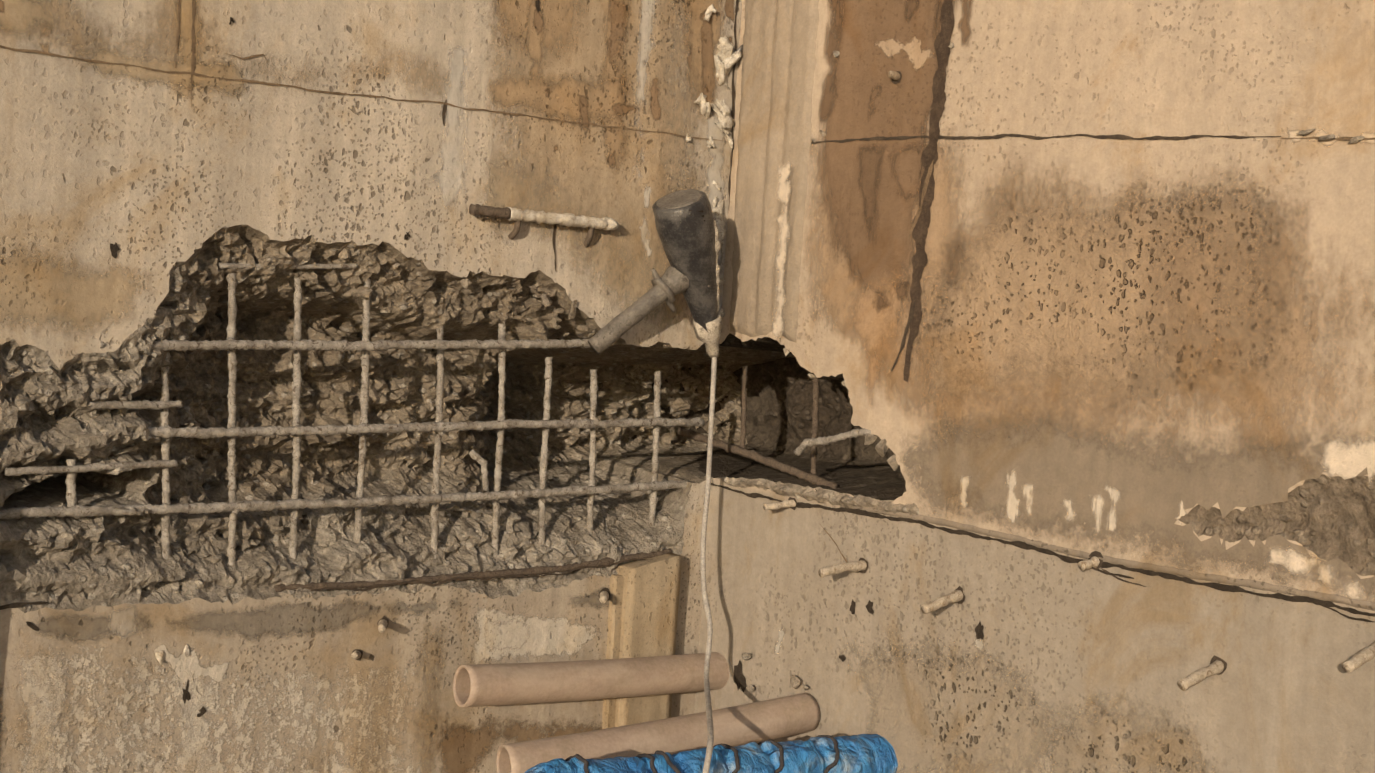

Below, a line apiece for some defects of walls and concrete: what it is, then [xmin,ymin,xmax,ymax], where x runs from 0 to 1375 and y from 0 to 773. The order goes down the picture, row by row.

crack [0,0,739,204]
crack [811,134,1375,144]
water stain [773,163,791,337]
water stain [808,0,1375,600]
spalling [0,225,930,665]
crack [711,483,1375,622]
spalling [1178,474,1375,576]
peeling [10,645,421,773]